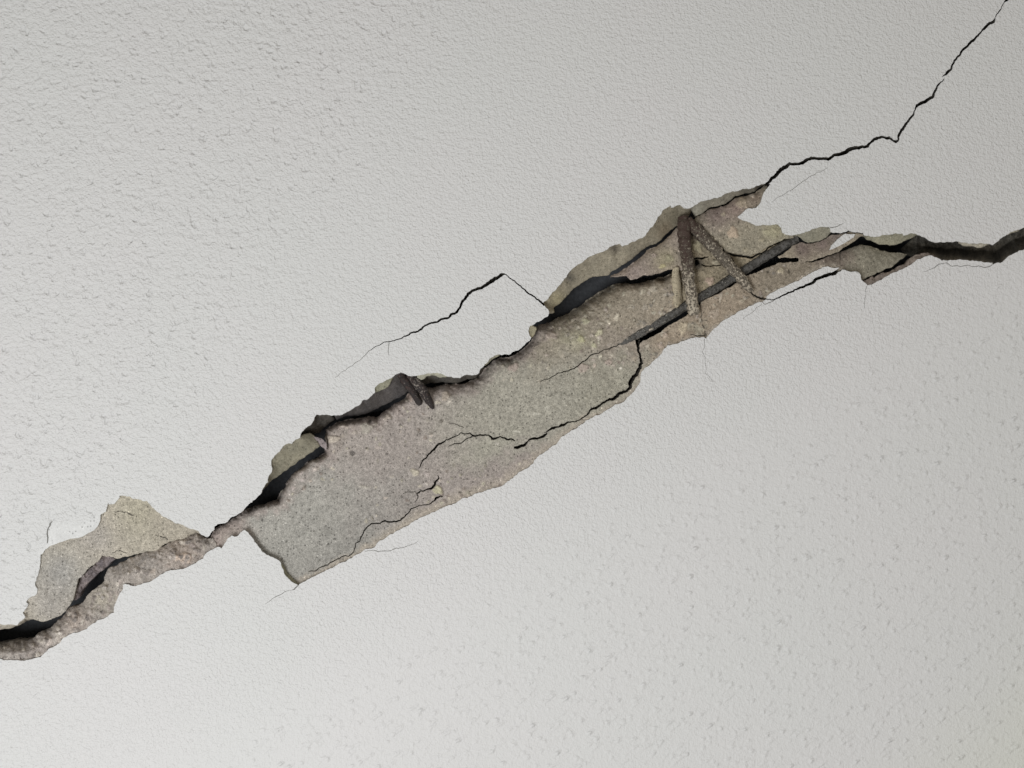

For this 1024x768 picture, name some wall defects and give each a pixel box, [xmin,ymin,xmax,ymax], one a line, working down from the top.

crack [764,0,1008,198]
crack [727,239,785,261]
crack [900,228,1024,272]
crack [335,273,545,378]
crack [691,305,710,378]
crack [744,270,841,318]
spalling [0,184,935,661]